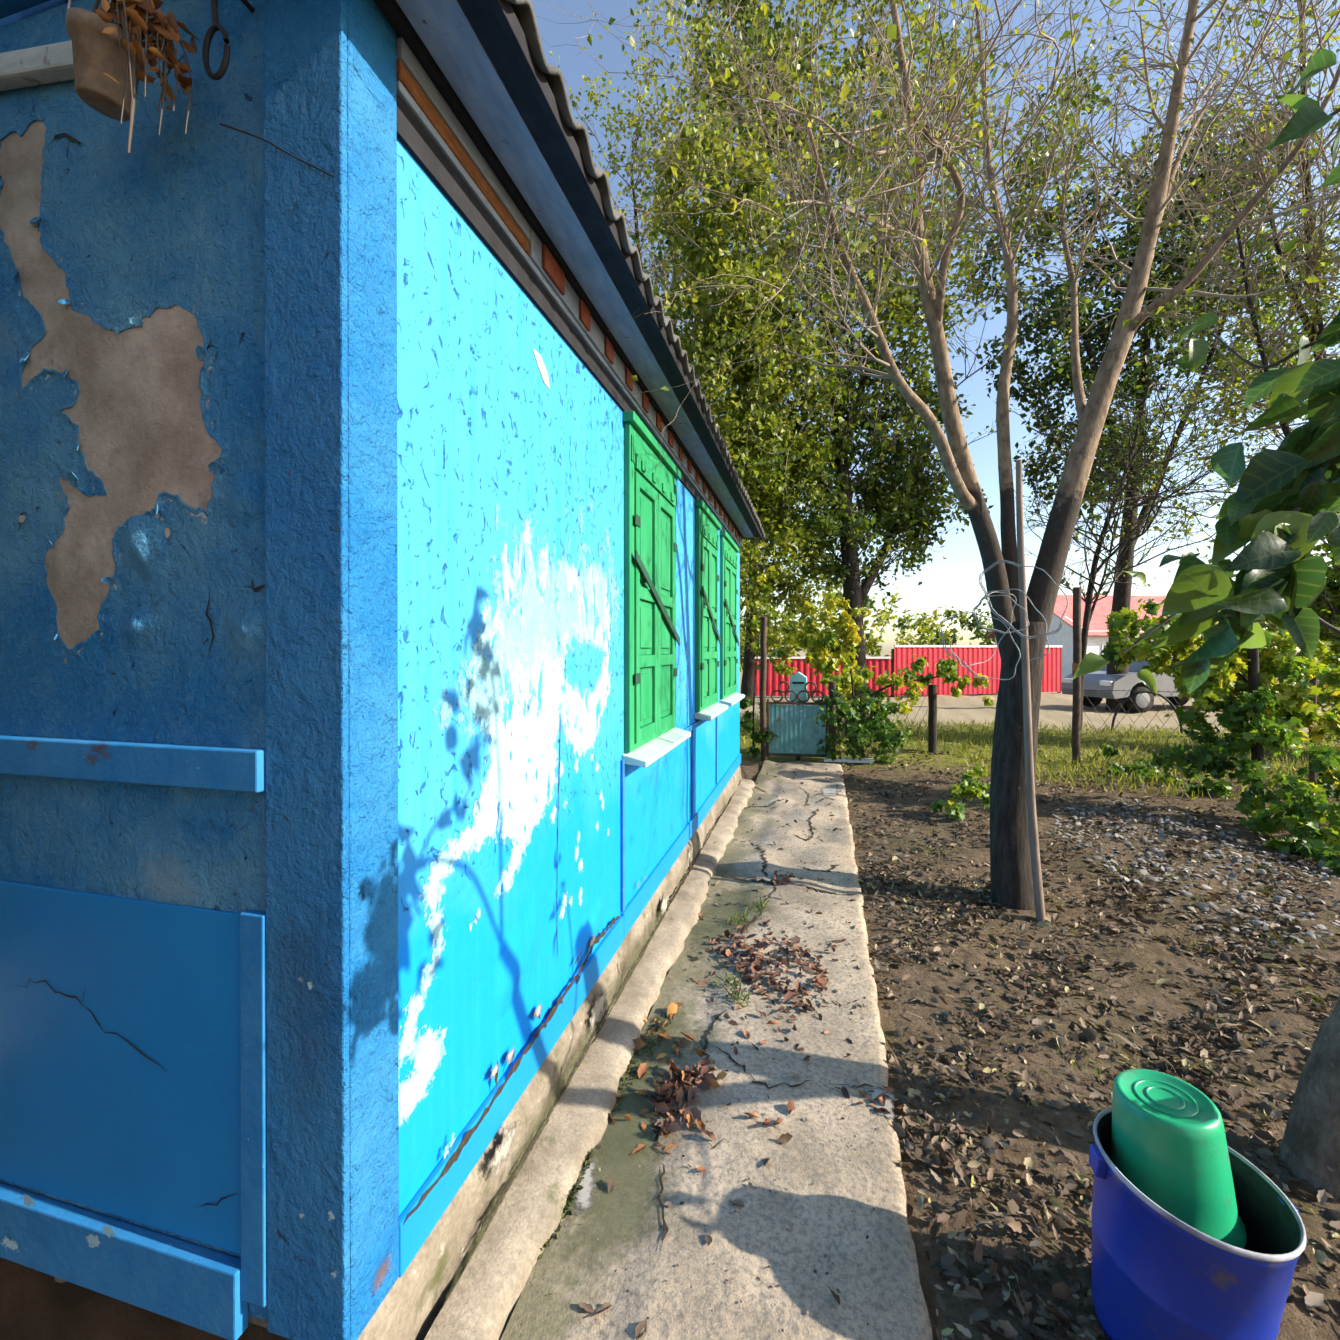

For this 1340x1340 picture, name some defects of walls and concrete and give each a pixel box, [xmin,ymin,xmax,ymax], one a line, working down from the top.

flaking render [0,111,233,664]
crack [18,978,163,1068]
peeling [398,503,624,1126]
crack [403,714,726,1253]